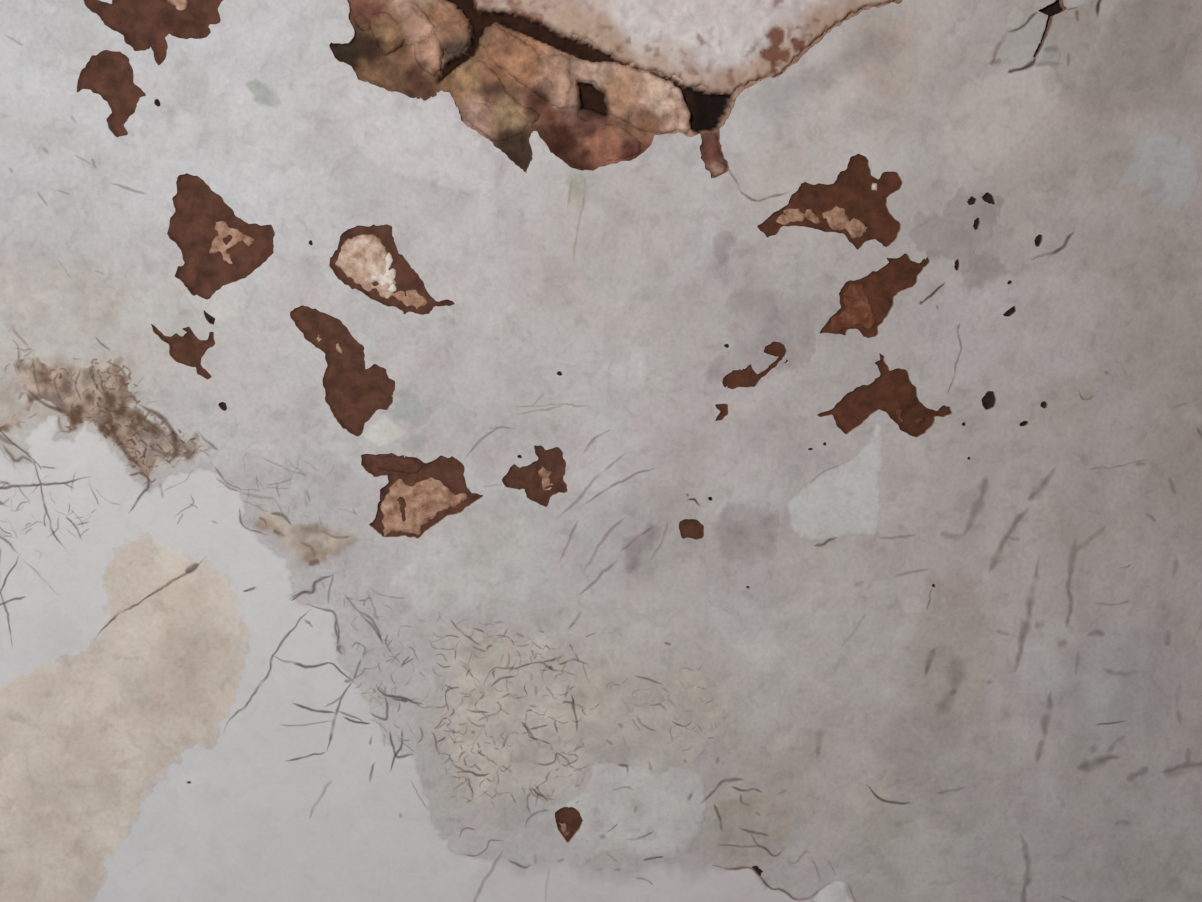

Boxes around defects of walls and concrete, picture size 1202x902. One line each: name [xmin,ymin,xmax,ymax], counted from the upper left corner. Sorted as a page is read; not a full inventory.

spalling [78,0,223,137]
peeling [329,87,498,194]
crack [995,0,1101,72]
leakage [0,241,224,484]
spalling [152,173,275,379]
spalling [291,305,483,538]
spalling [330,224,455,315]
spalling [722,341,787,389]
spalling [757,154,929,338]
peeling [787,353,951,546]
leakage [0,533,252,902]
peeling [0,416,854,902]